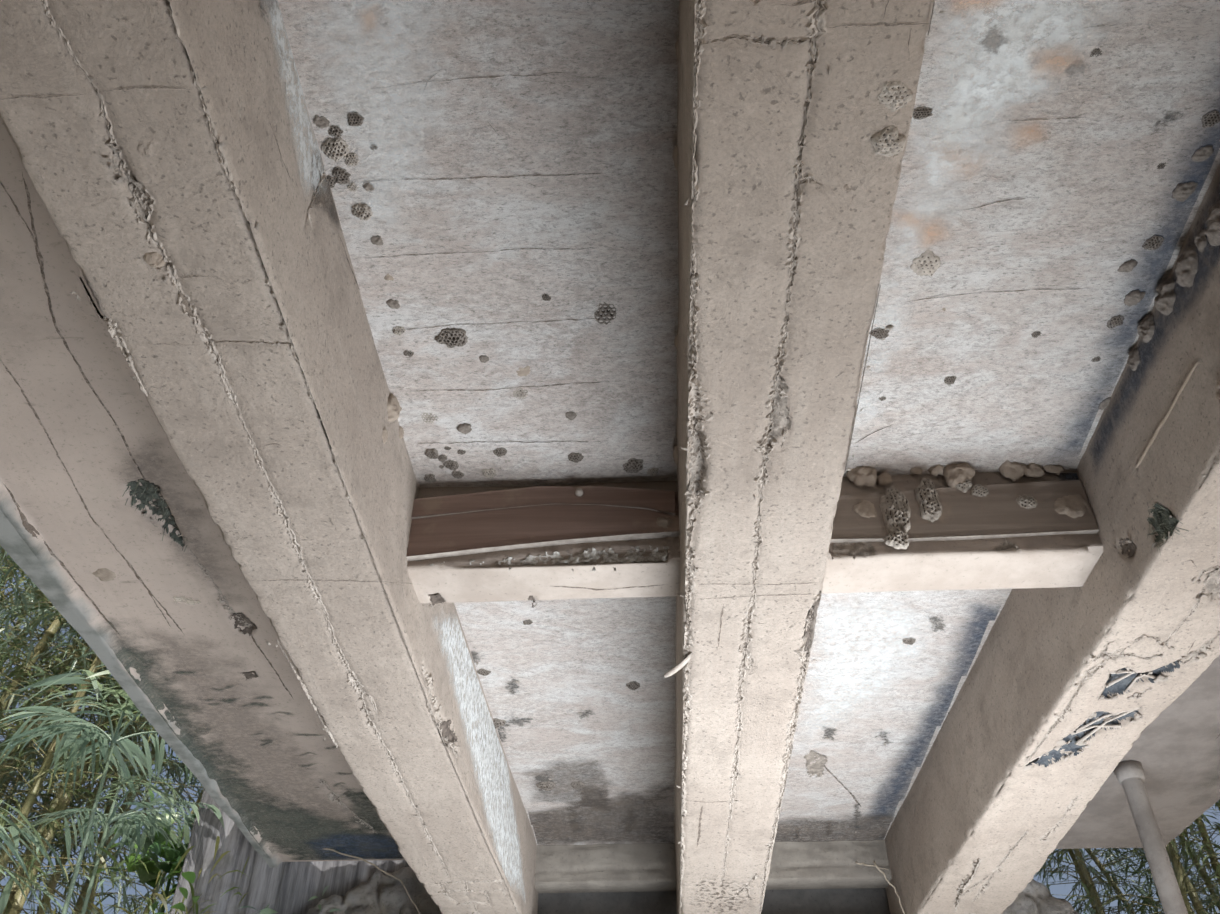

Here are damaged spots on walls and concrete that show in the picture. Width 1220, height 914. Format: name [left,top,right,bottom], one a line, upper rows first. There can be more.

leakage [1071,113,1220,459]
spalling [122,478,192,552]
crack [0,0,507,914]
leakage [116,647,403,860]
spalling [167,1,519,914]
crack [684,0,927,899]
spalling [1023,632,1220,770]
spalling [1113,502,1189,558]
crack [1083,543,1220,699]